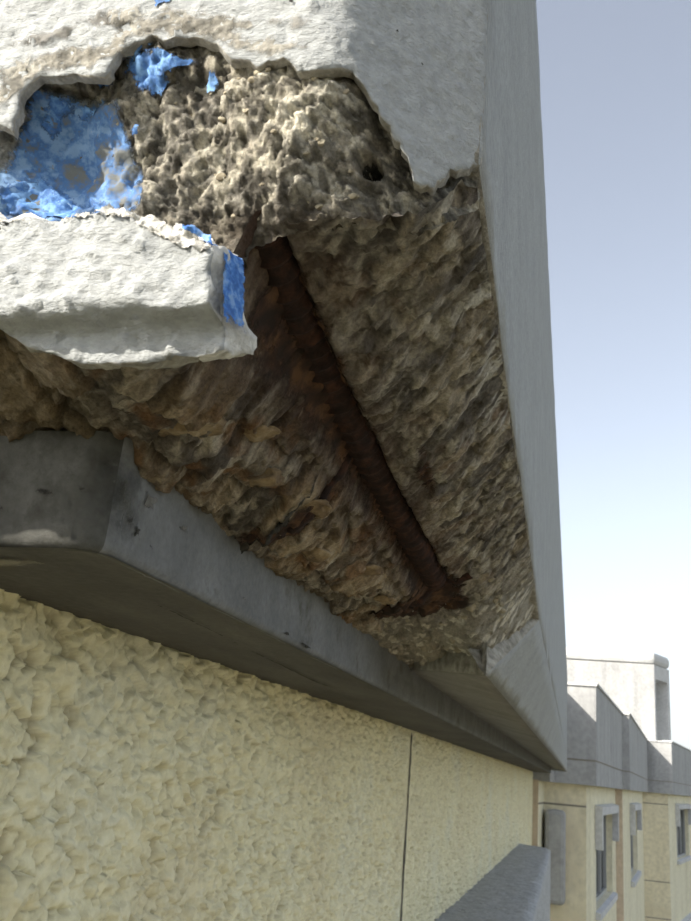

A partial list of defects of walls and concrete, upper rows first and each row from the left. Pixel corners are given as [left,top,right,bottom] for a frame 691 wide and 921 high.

peeling [198,14,252,33]
spalling [0,42,480,326]
peeling [244,424,281,443]
corrosion [236,236,473,620]
crack [400,733,413,921]